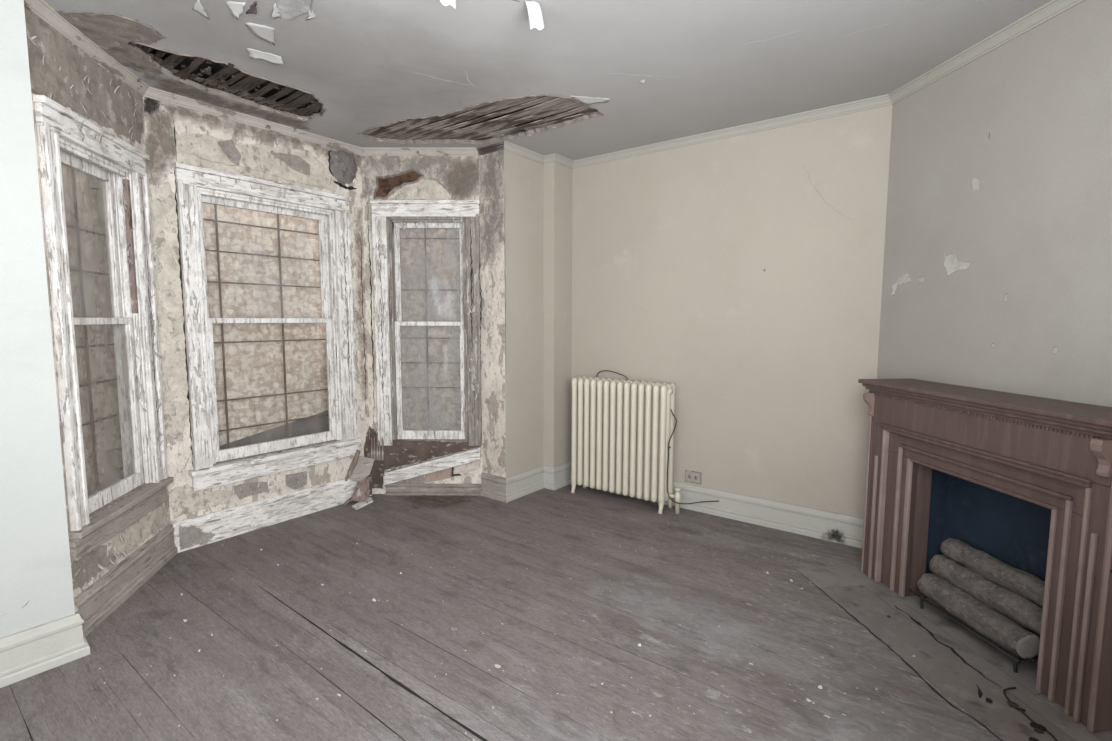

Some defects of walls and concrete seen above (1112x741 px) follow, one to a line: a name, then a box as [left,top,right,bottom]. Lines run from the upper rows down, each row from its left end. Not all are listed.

peeling [192,0,210,20]
peeling [513,0,544,30]
peeling [226,0,316,65]
peeling [569,96,611,105]